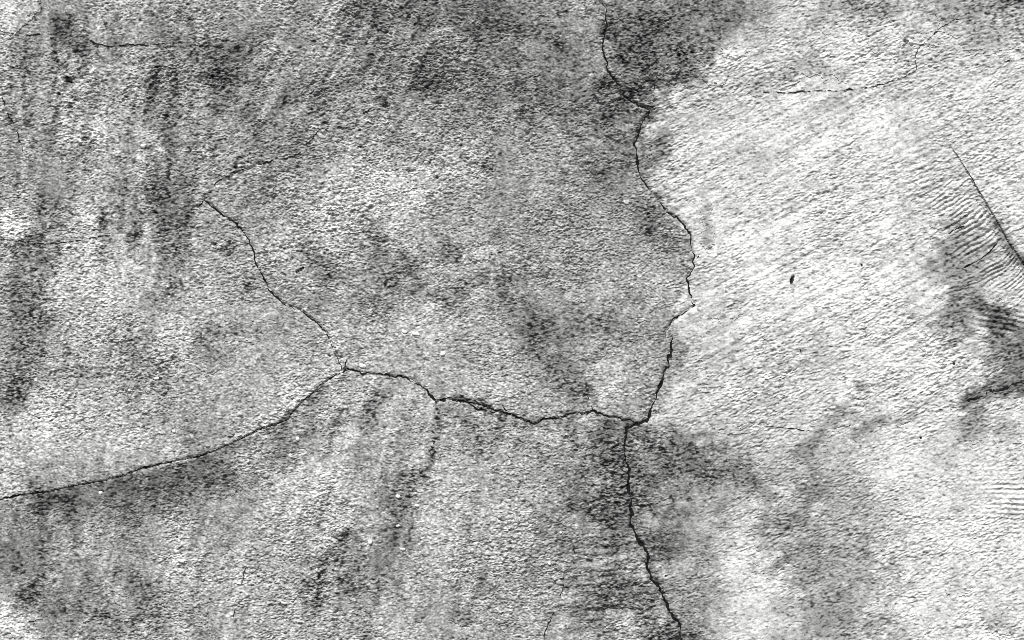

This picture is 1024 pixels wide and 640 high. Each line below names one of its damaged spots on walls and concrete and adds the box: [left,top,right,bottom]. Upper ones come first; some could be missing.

crack [0,0,699,640]